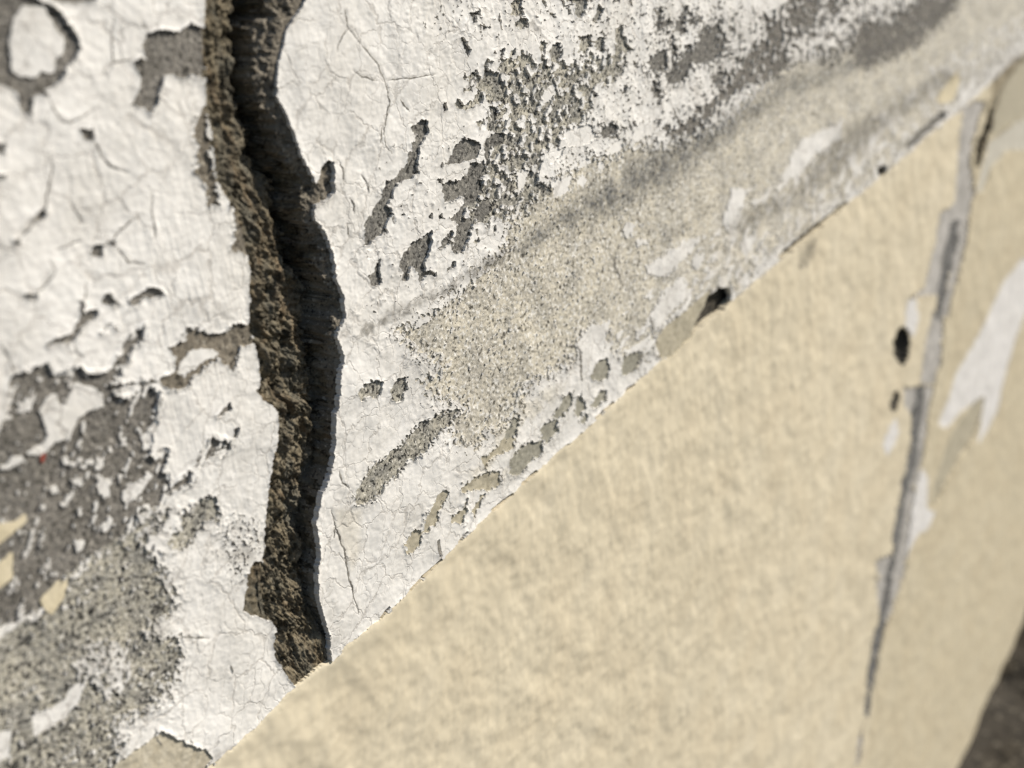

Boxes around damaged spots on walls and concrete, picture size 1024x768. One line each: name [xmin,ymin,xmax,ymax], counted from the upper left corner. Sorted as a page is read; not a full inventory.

peeling [0,0,91,114]
peeling [79,128,93,141]
peeling [91,240,114,257]
peeling [0,323,258,768]
peeling [131,22,203,112]
crack [202,0,369,685]
peeling [351,0,1024,556]
crack [854,100,994,766]